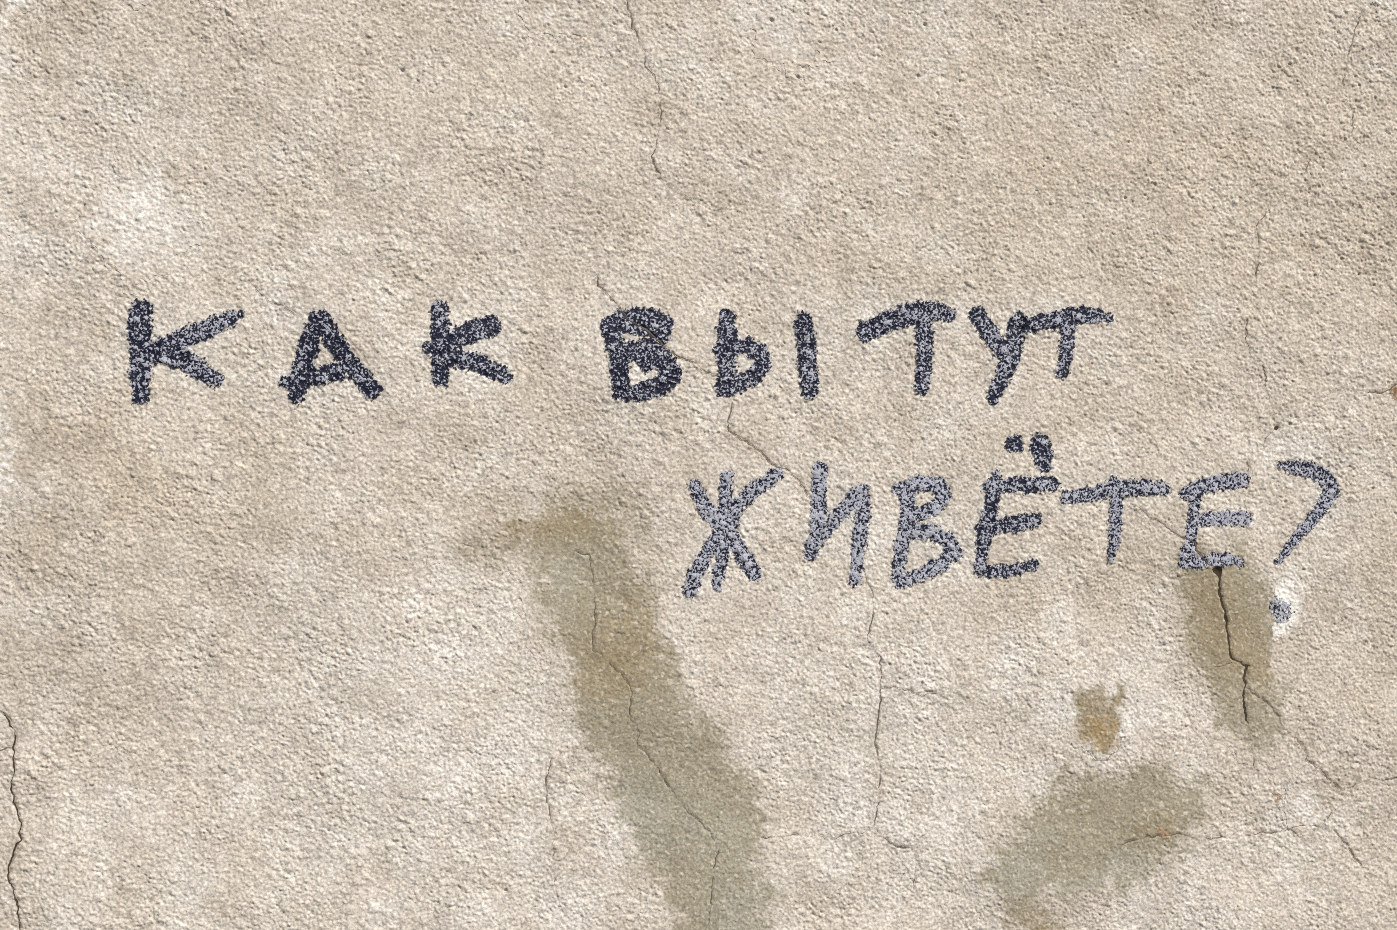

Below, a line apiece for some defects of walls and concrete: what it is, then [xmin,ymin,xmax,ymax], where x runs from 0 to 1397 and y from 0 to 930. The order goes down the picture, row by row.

crack [627,0,753,208]
crack [0,710,22,930]
leakage [423,459,805,930]
crack [573,550,719,922]
leakage [956,504,1324,930]
crack [1092,444,1397,878]